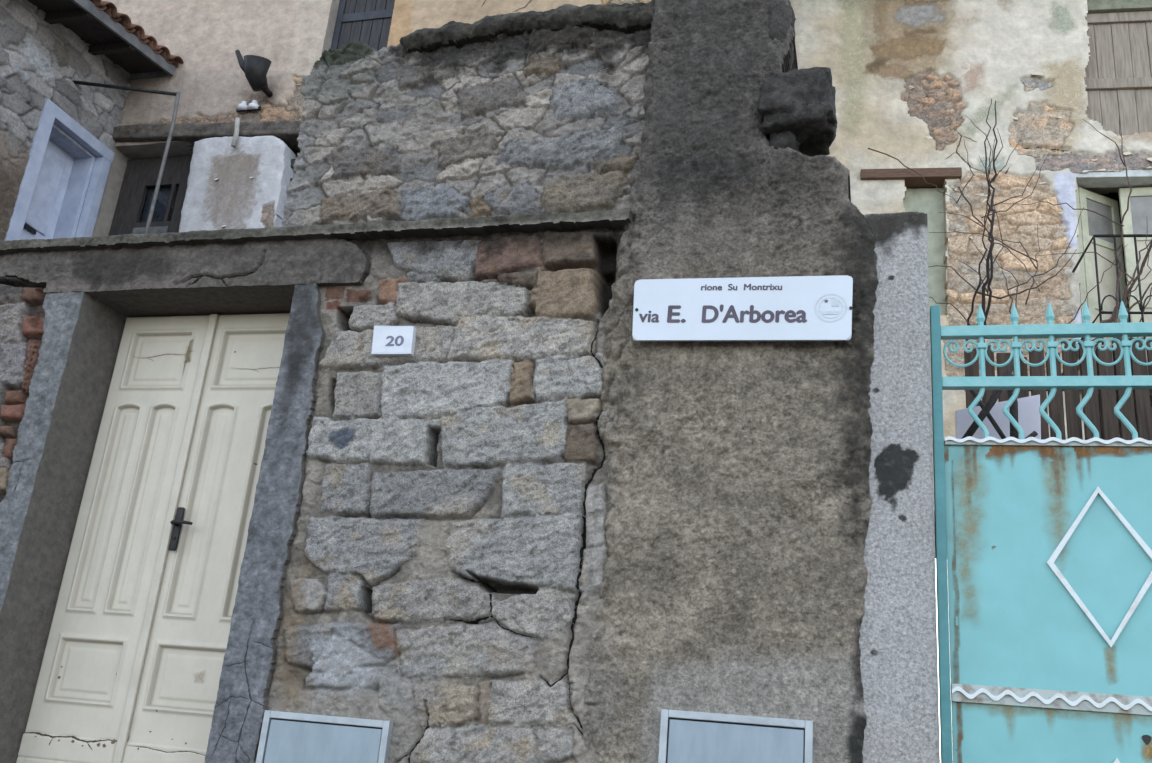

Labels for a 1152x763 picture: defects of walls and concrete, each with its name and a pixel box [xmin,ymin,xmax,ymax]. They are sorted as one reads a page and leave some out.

flaking render [151,76,305,124]
flaking render [902,70,966,151]
flaking render [943,71,1152,377]
crack [180,254,265,292]
crack [591,325,603,368]
leakage [874,443,919,521]
corrosion [965,445,1152,493]
crack [454,573,538,638]
crack [541,414,606,734]
crack [21,621,271,763]
crack [401,709,429,763]
corrosion [1143,741,1152,759]